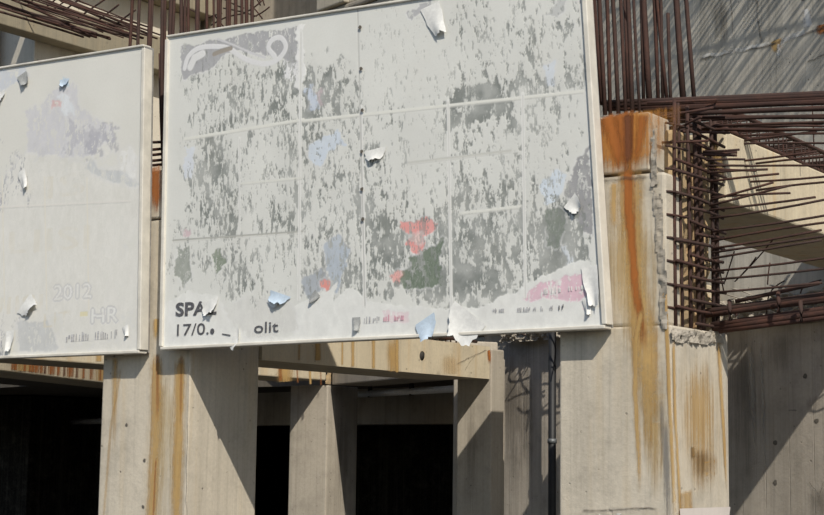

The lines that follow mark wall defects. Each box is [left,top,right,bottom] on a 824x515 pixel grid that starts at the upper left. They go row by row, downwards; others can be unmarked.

spalling [0,0,270,167]
spalling [593,0,824,345]
rust [11,356,103,381]
rust [148,359,161,515]
rust [172,361,184,515]
rust [389,340,399,372]
rust [601,110,726,511]